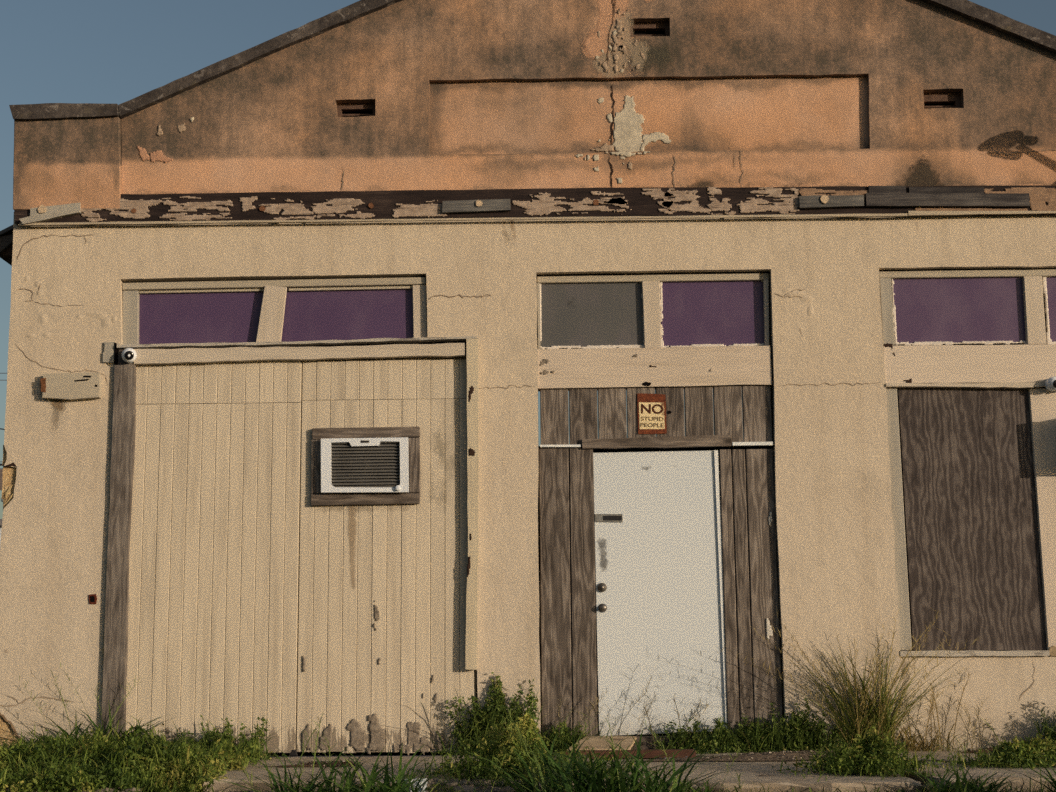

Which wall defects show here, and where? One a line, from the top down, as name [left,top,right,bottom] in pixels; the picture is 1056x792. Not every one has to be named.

peeling [583,0,646,73]
crack [606,0,618,187]
peeling [512,95,671,216]
leakage [905,162,944,186]
peeling [80,196,375,222]
peeling [392,200,447,218]
peeling [641,186,869,215]
peeling [915,187,1056,211]
crack [17,234,87,260]
spalling [2,445,17,509]
spalling [0,713,20,748]
peeling [346,713,451,755]